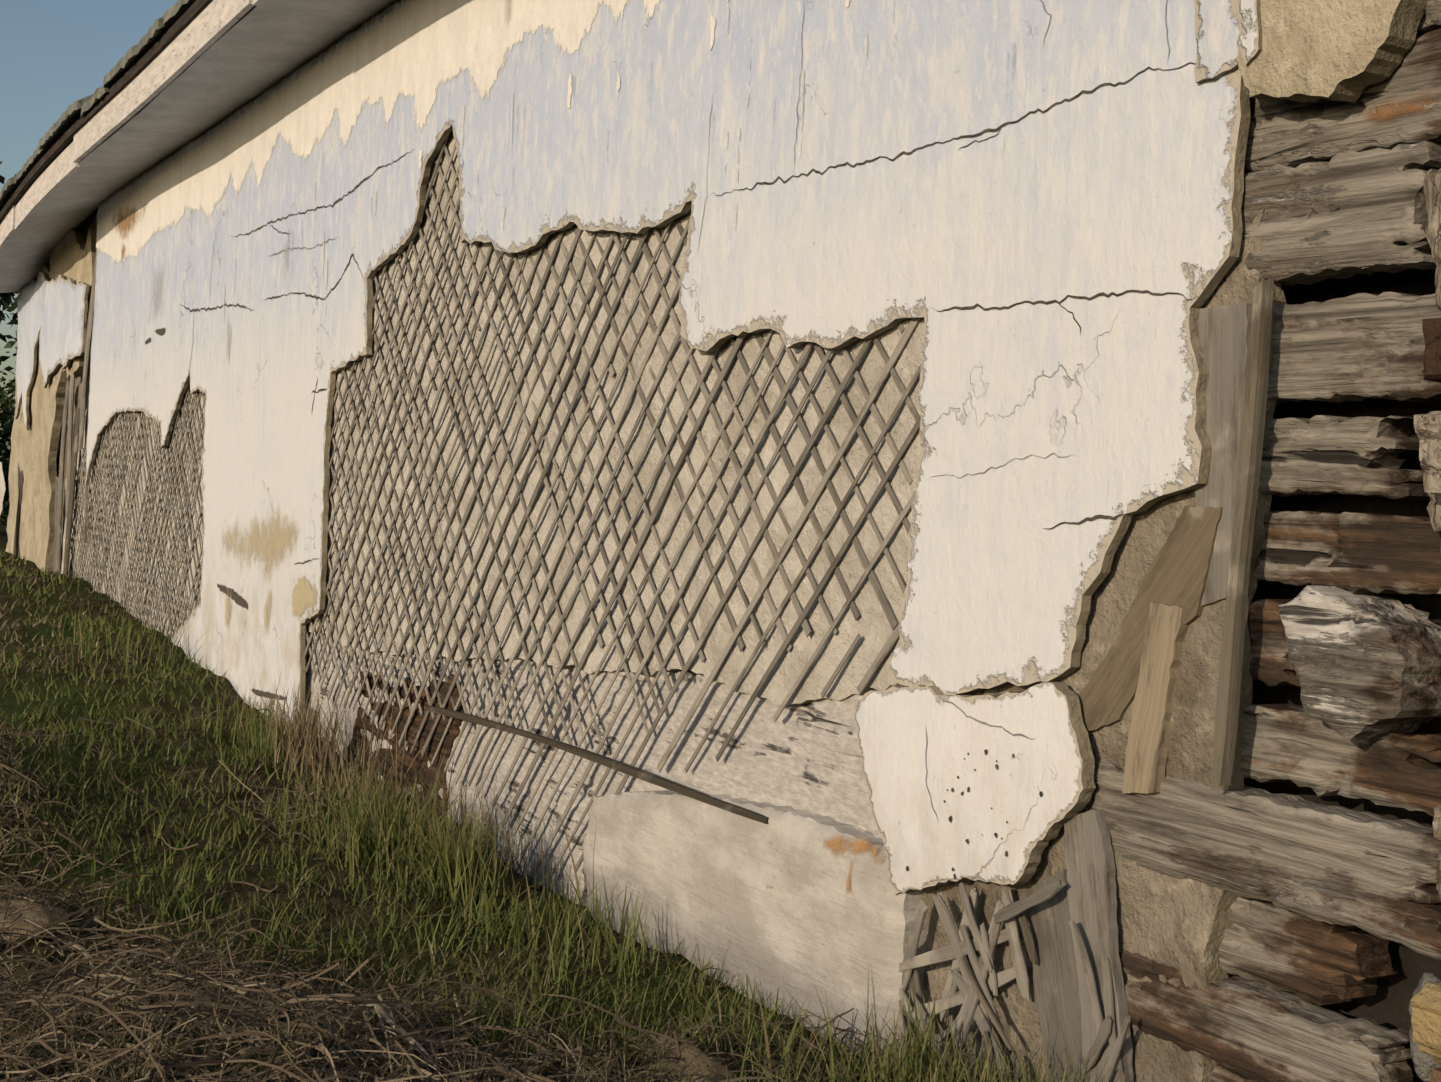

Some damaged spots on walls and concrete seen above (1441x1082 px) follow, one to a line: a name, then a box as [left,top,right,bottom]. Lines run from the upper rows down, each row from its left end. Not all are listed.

crack [697,1,1196,251]
spalling [1238,0,1428,103]
crack [179,149,414,370]
peeling [5,0,659,639]
crack [930,290,1198,330]
spalling [305,130,925,880]
crack [926,453,1070,480]
crack [1043,514,1122,529]
spalling [964,208,1286,794]
spalling [249,688,286,700]
corrosion [825,837,877,855]
spalling [898,793,1243,1082]